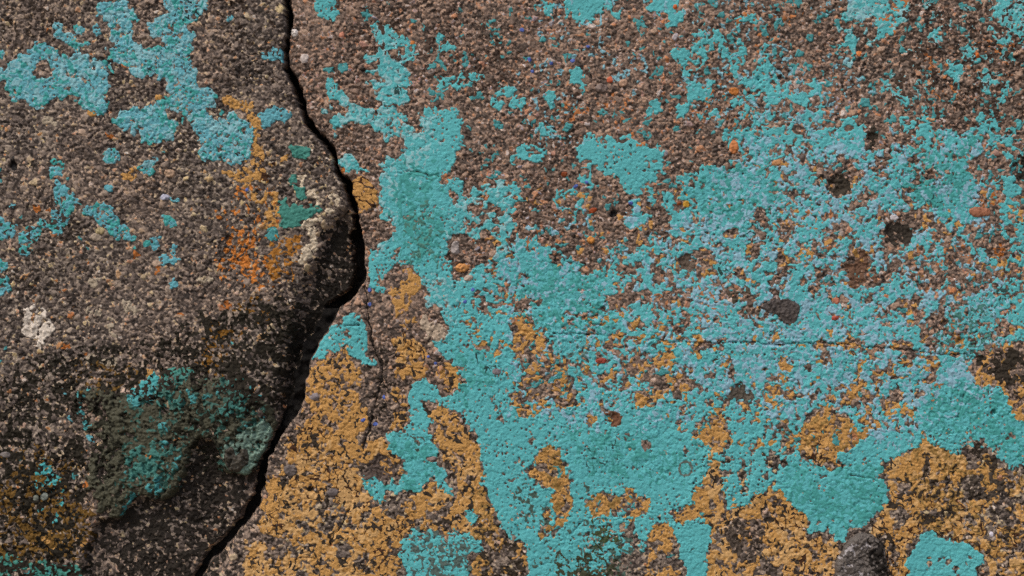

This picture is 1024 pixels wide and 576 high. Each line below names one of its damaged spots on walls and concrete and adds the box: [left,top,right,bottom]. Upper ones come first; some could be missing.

spalling [866,125,879,151]
spalling [828,173,851,196]
spalling [297,175,340,265]
spalling [883,222,913,246]
crack [194,0,454,576]
spalling [420,314,447,346]
spalling [976,347,1024,395]
spalling [726,383,755,405]
spalling [603,411,623,427]
spalling [961,440,1005,502]
spalling [724,518,766,563]
spalling [478,542,526,576]